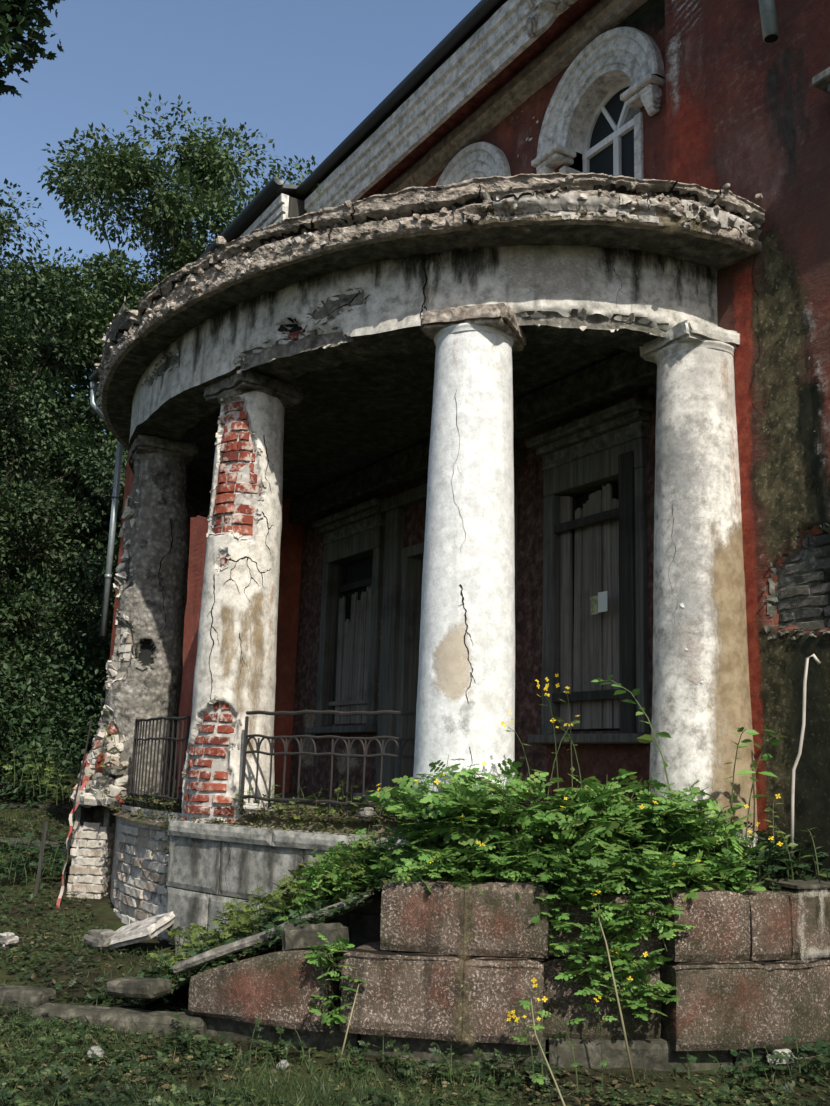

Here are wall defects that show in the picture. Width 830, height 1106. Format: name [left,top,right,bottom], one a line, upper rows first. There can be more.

efflorescence [668,37,690,108]
spalling [483,190,660,223]
water stain [195,305,237,365]
spalling [232,287,370,374]
water stain [405,253,439,301]
water stain [452,247,593,296]
spalling [206,396,267,540]
crack [209,436,275,700]
spalling [70,459,158,808]
crack [459,584,476,704]
water stain [709,381,830,915]
spalling [180,695,242,824]